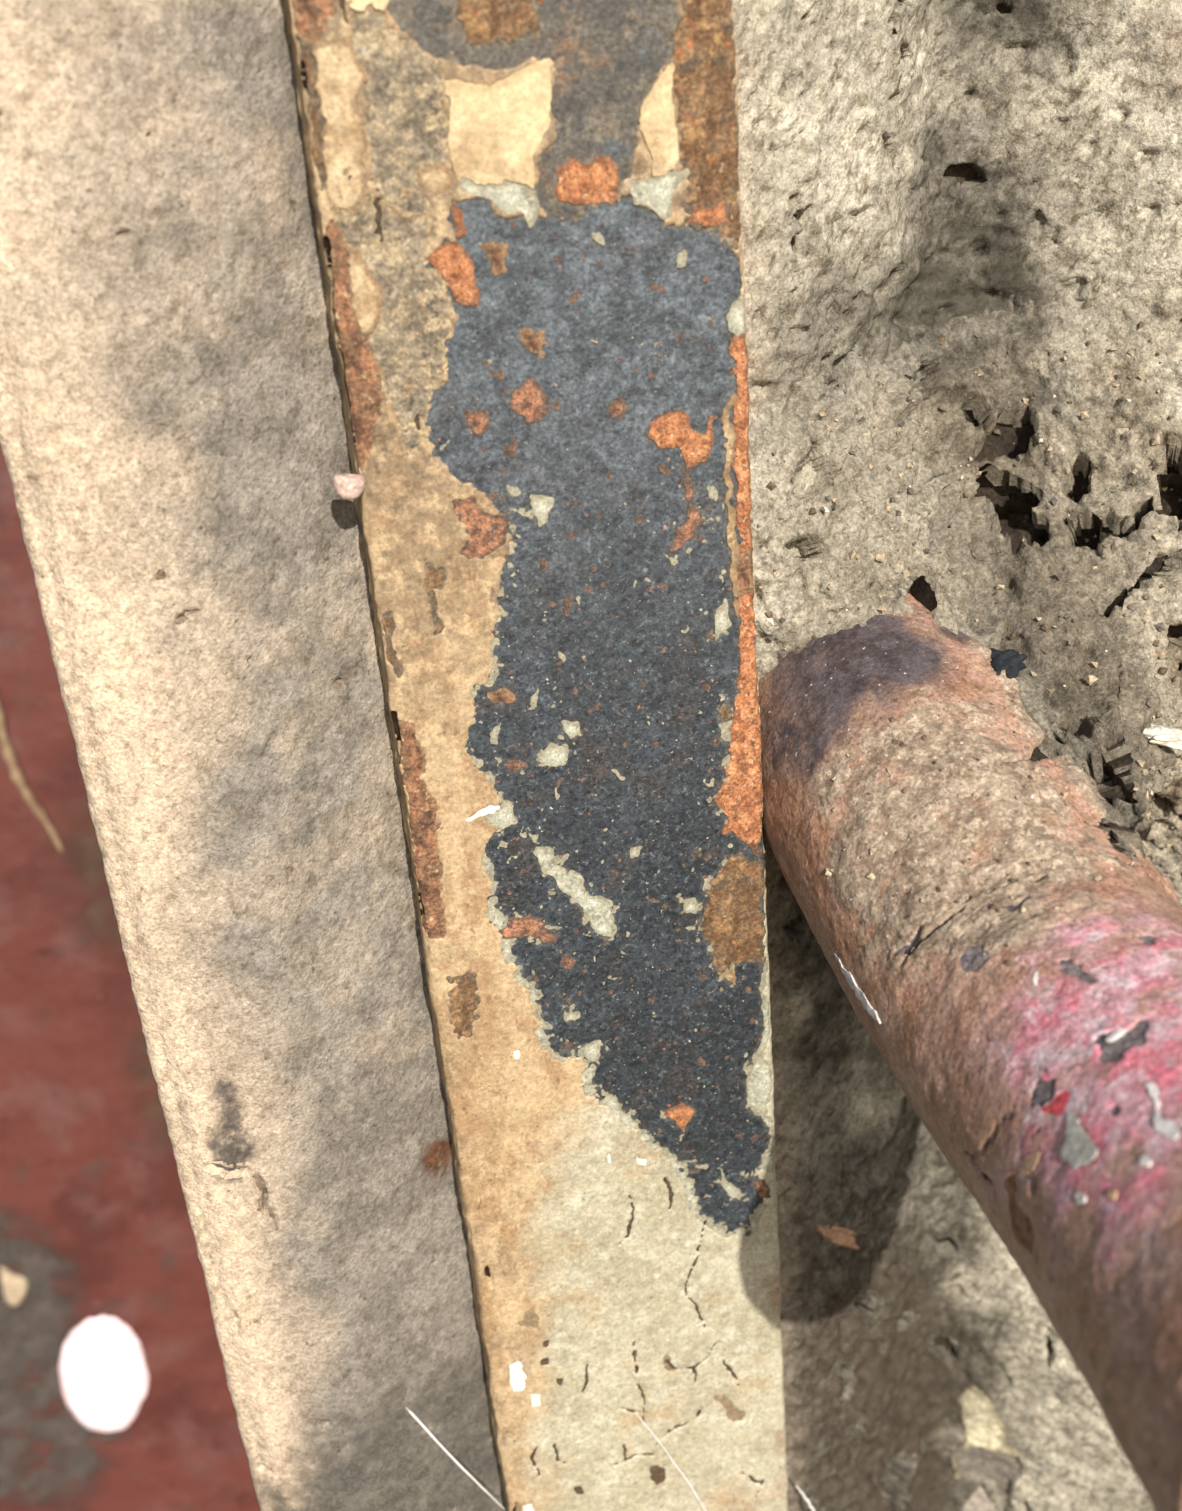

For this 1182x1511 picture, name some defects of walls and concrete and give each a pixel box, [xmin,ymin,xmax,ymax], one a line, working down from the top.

rust [555,156,619,209]
rust [630,0,741,267]
peeling [312,0,808,1239]
rust [647,333,766,978]
spalling [990,648,1028,679]
rust [398,720,448,939]
crack [581,1364,589,1392]
crack [614,1177,739,1465]
crack [742,1472,765,1495]